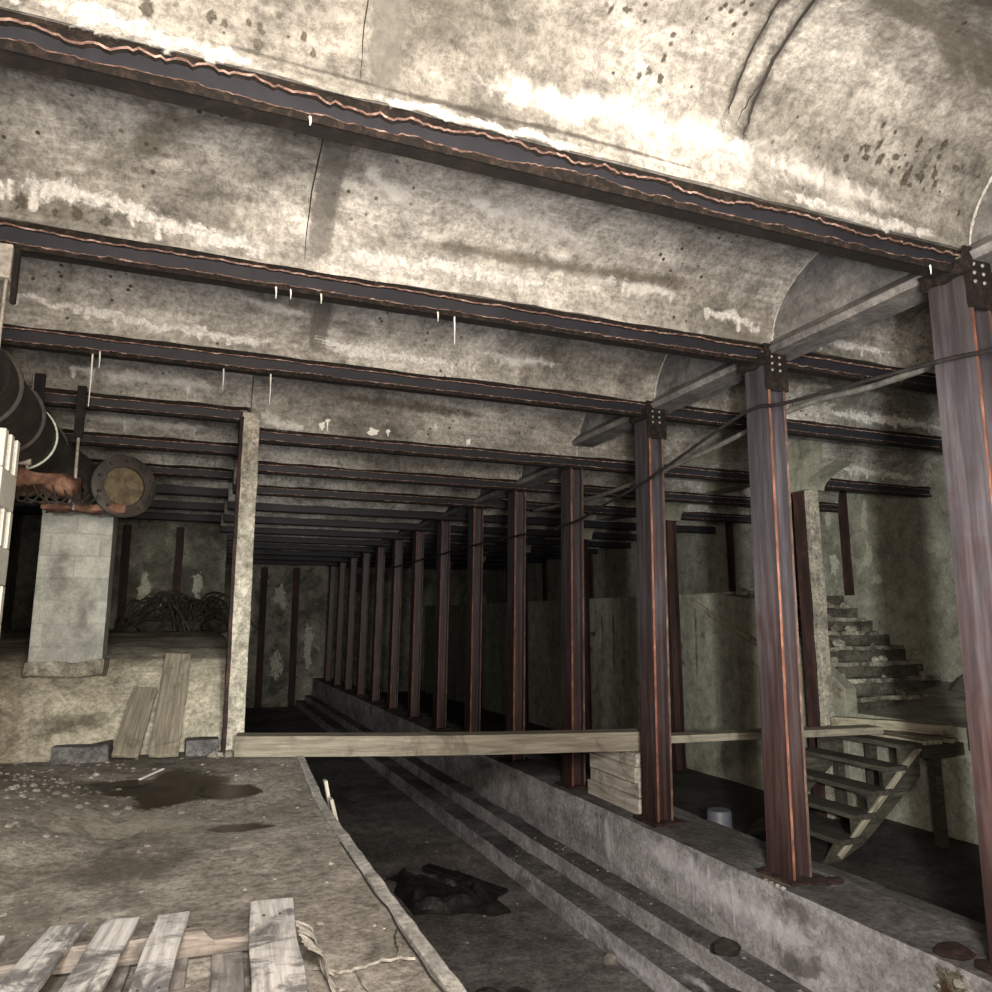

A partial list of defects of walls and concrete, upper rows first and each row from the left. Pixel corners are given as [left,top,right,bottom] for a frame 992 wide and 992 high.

leakage [318,0,761,169]
crack [723,0,816,163]
spalling [860,122,948,195]
leakage [0,172,270,259]
leakage [703,307,760,333]
leakage [26,768,262,843]
leakage [208,822,273,832]